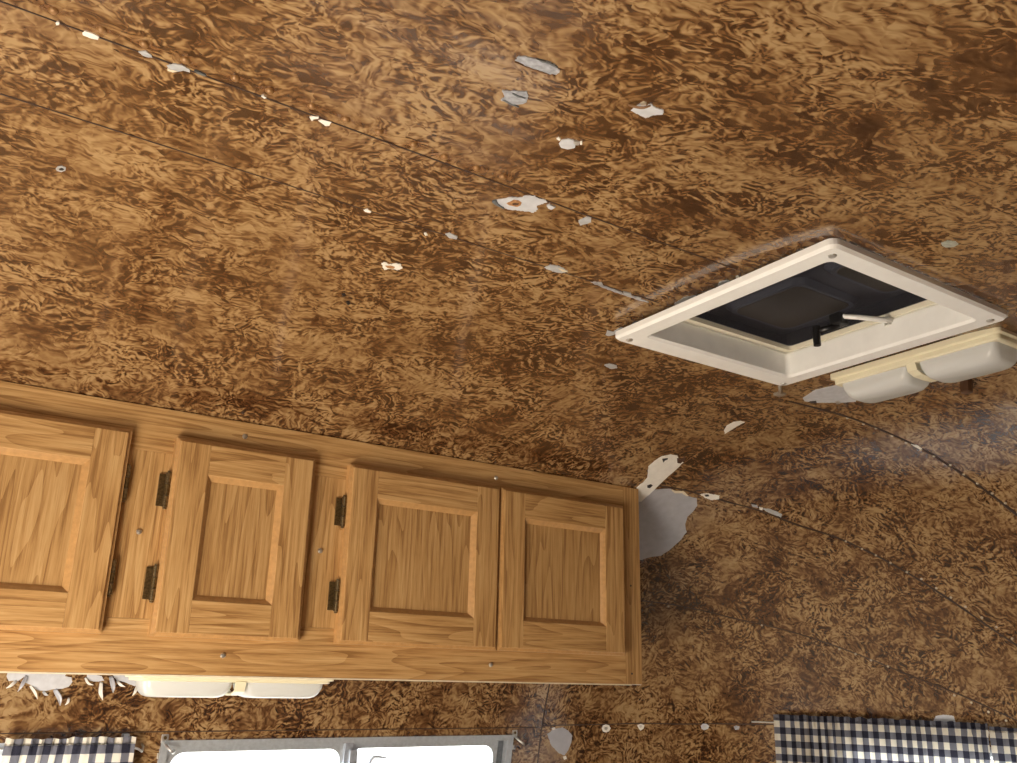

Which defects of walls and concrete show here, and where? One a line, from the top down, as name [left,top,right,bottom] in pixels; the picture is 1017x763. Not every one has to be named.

peeling [167,63,206,76]
peeling [628,101,664,118]
peeling [557,137,582,149]
peeling [492,195,555,213]
peeling [803,385,856,404]
peeling [637,454,720,560]
peeling [7,673,72,706]
peeling [85,675,137,700]
peeling [547,727,572,760]